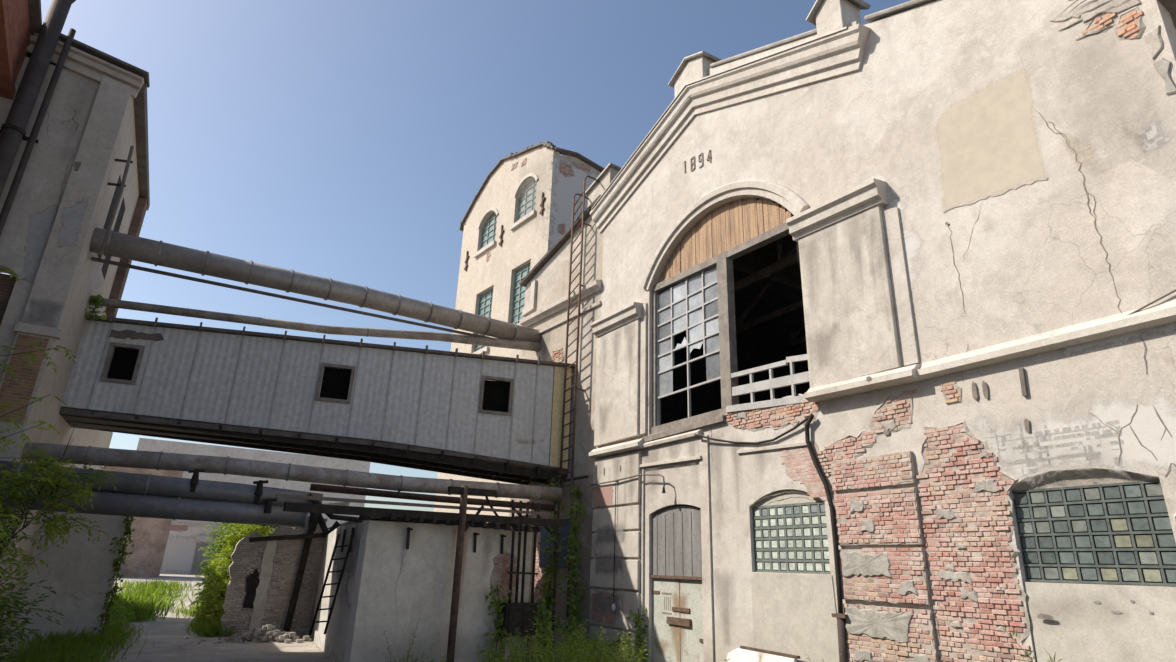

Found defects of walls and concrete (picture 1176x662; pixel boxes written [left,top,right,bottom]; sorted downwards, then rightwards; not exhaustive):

flaking render [1050,0,1176,95]
flaking render [21,205,57,283]
crack [948,203,982,314]
crack [1035,110,1122,313]
flaking render [725,394,822,432]
flaking render [940,380,988,405]
crack [1088,404,1176,477]
crack [1139,337,1147,374]
flaking render [780,389,1054,662]
flaking render [490,551,517,603]